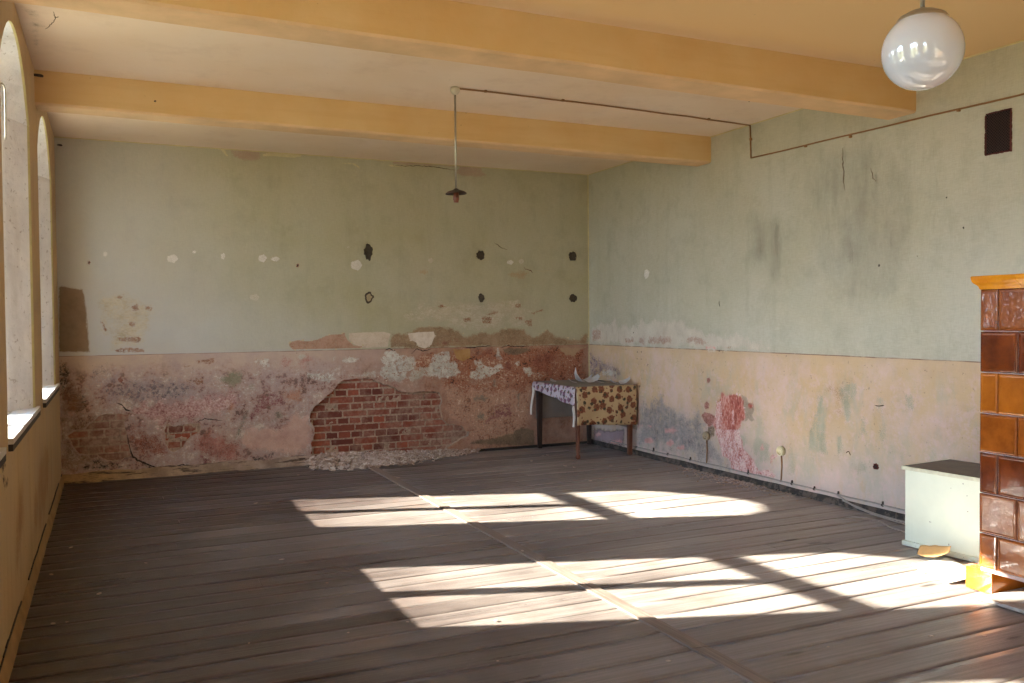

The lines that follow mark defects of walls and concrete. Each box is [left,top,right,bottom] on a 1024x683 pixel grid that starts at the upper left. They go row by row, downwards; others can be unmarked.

spalling [364,244,373,261]
peeling [281,325,589,369]
crack [117,403,184,467]
spalling [164,423,201,452]
spalling [310,378,469,456]
water stain [637,386,730,472]
peeling [702,392,796,477]